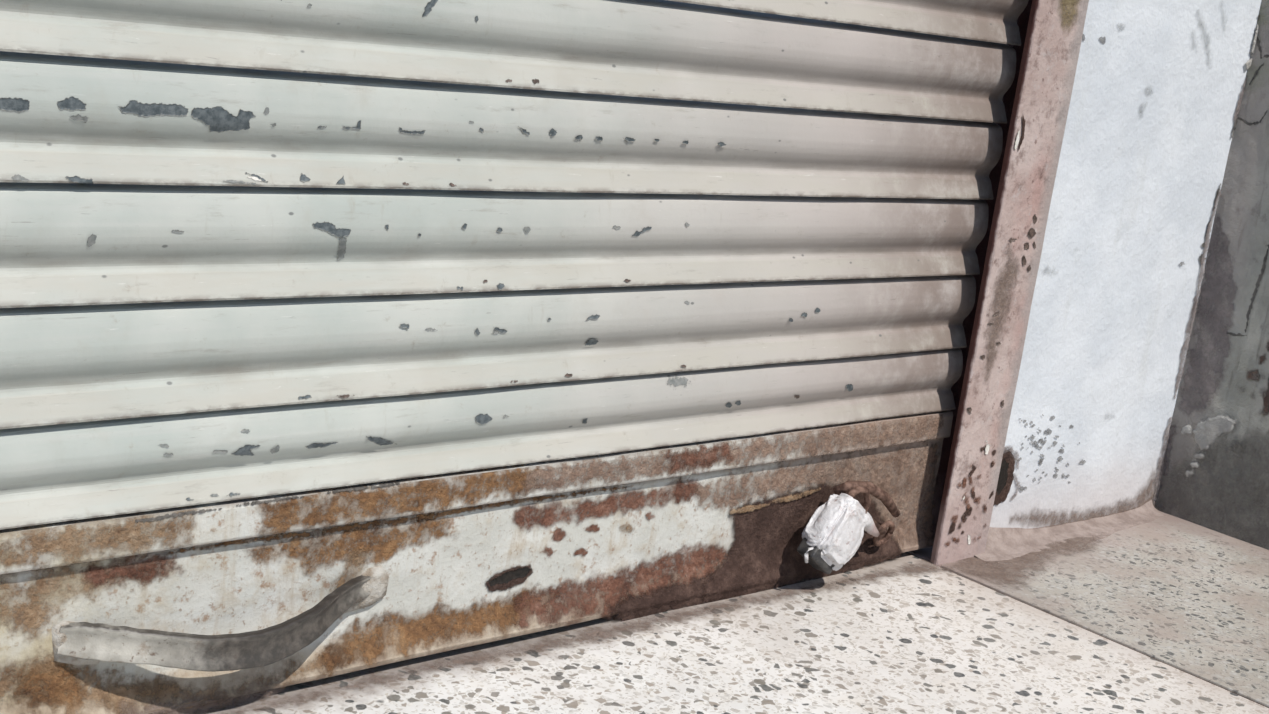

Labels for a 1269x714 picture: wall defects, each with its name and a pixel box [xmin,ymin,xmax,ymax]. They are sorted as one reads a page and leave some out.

peeling [0,97,30,113]
peeling [57,96,88,123]
peeling [119,100,276,133]
crack [1231,15,1269,138]
crack [1179,184,1221,332]
crack [1226,245,1269,336]
spalling [993,446,1020,506]
corrosion [0,412,996,714]
peeling [486,565,533,592]